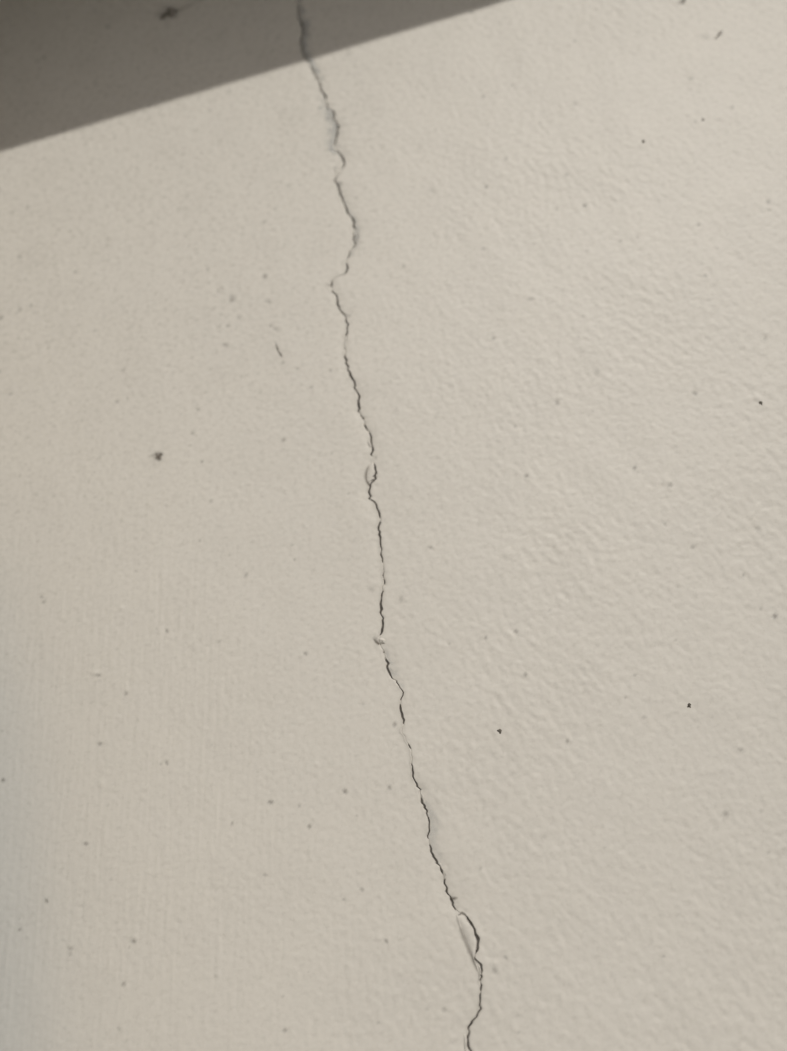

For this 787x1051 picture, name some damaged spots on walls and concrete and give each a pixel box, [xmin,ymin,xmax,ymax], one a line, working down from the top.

crack [160,8,176,20]
crack [297,6,483,1051]